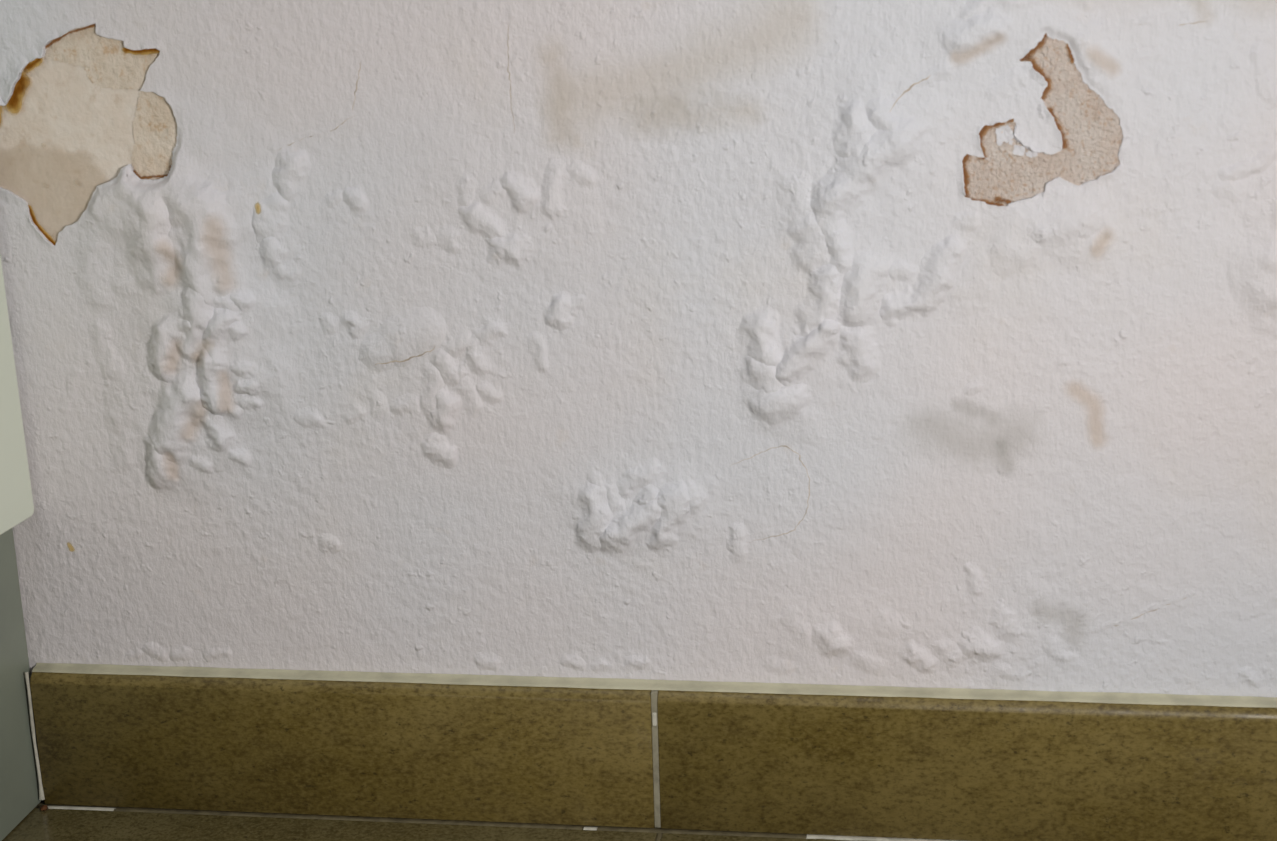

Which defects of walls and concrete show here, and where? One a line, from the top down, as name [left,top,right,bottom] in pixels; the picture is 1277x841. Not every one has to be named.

peeling [0,13,186,254]
peeling [954,30,1139,217]